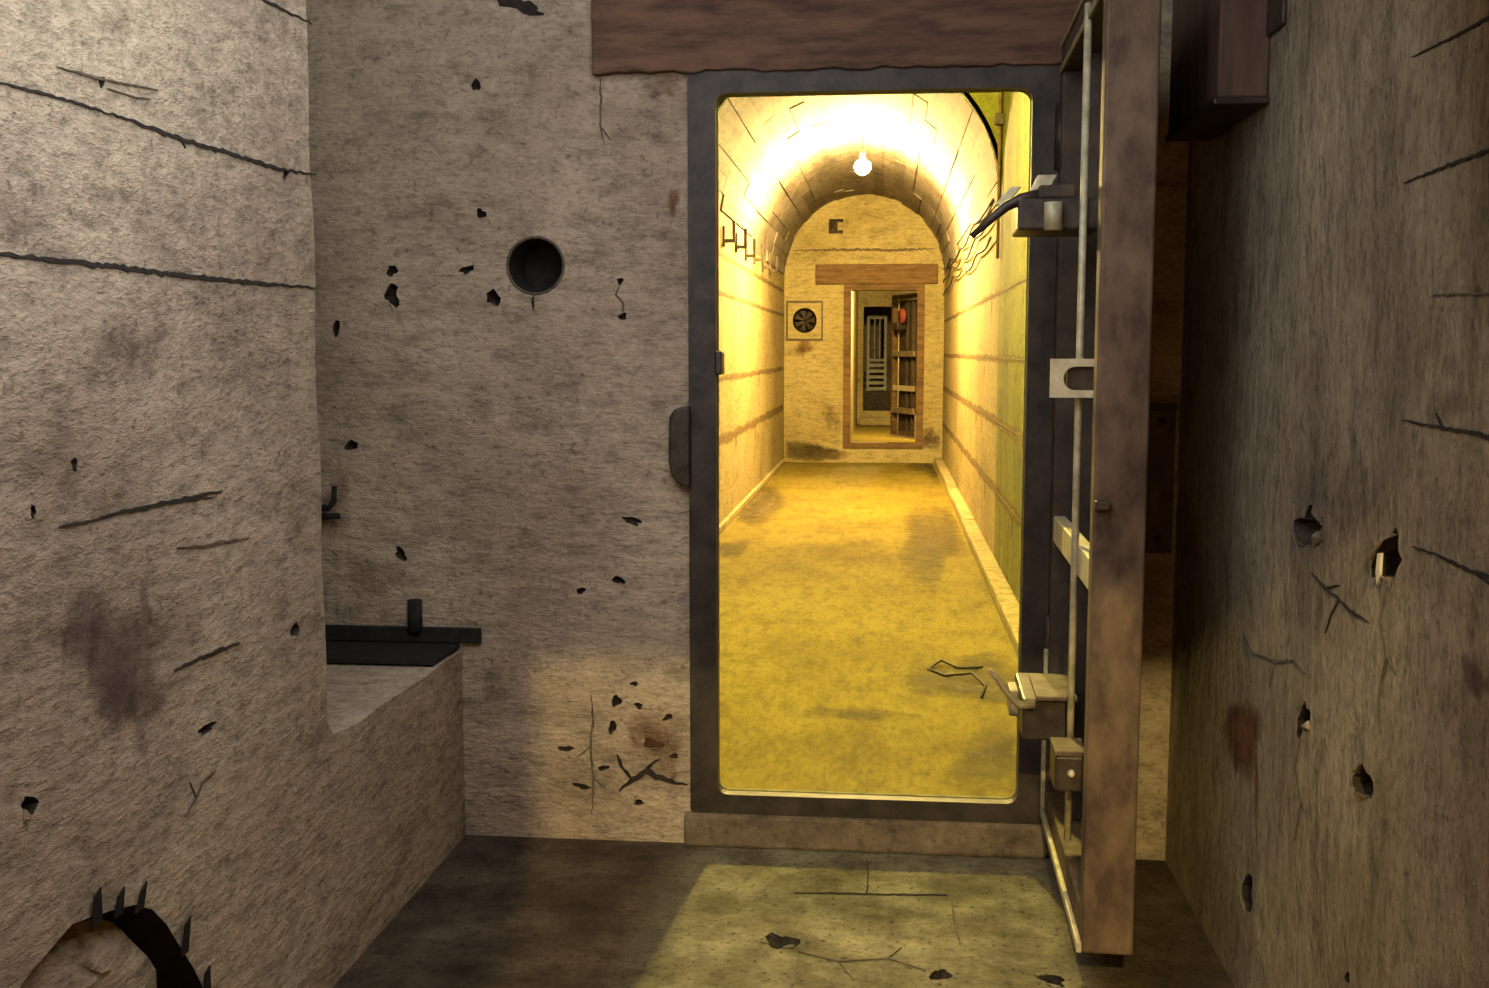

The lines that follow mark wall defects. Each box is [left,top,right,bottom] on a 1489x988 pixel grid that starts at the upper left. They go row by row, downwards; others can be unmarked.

crack [262,0,312,24]
crack [1411,16,1489,57]
crack [0,67,316,175]
crack [1404,148,1489,183]
crack [0,252,316,289]
crack [1401,413,1489,441]
crack [59,490,223,527]
spalling [1291,505,1323,547]
spalling [1369,528,1402,587]
crack [1311,573,1397,735]
crack [578,695,688,814]
spalling [1351,763,1374,803]